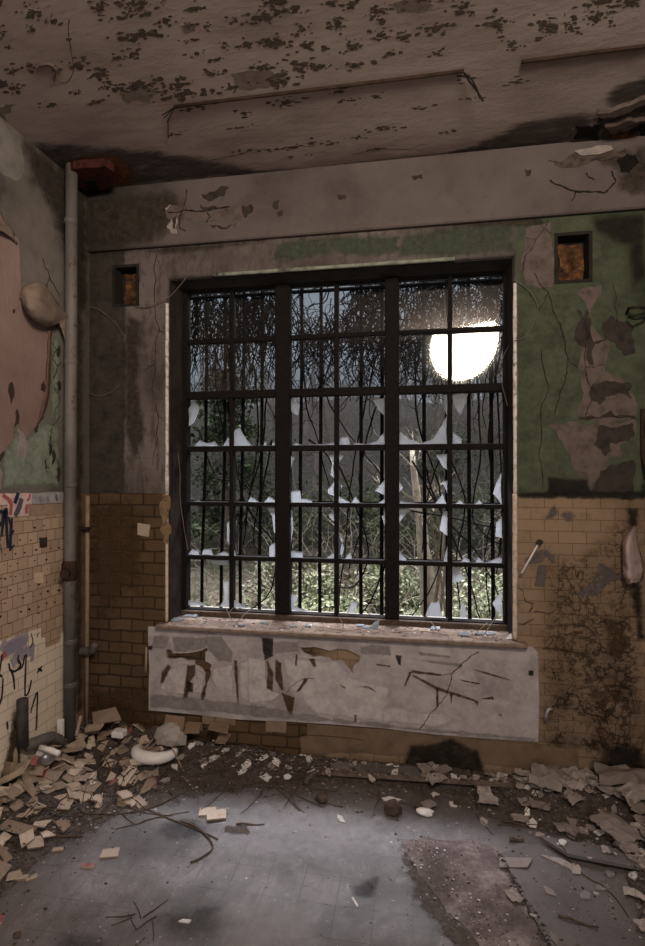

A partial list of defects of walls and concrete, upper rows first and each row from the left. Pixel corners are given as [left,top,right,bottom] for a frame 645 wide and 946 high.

peeling [0,0,645,181]
peeling [165,186,253,234]
crack [550,171,616,201]
peeling [3,337,61,487]
leakage [25,142,278,730]
flaking render [549,285,638,500]
peeling [0,503,63,624]
crack [419,651,479,730]
leakage [518,478,645,769]